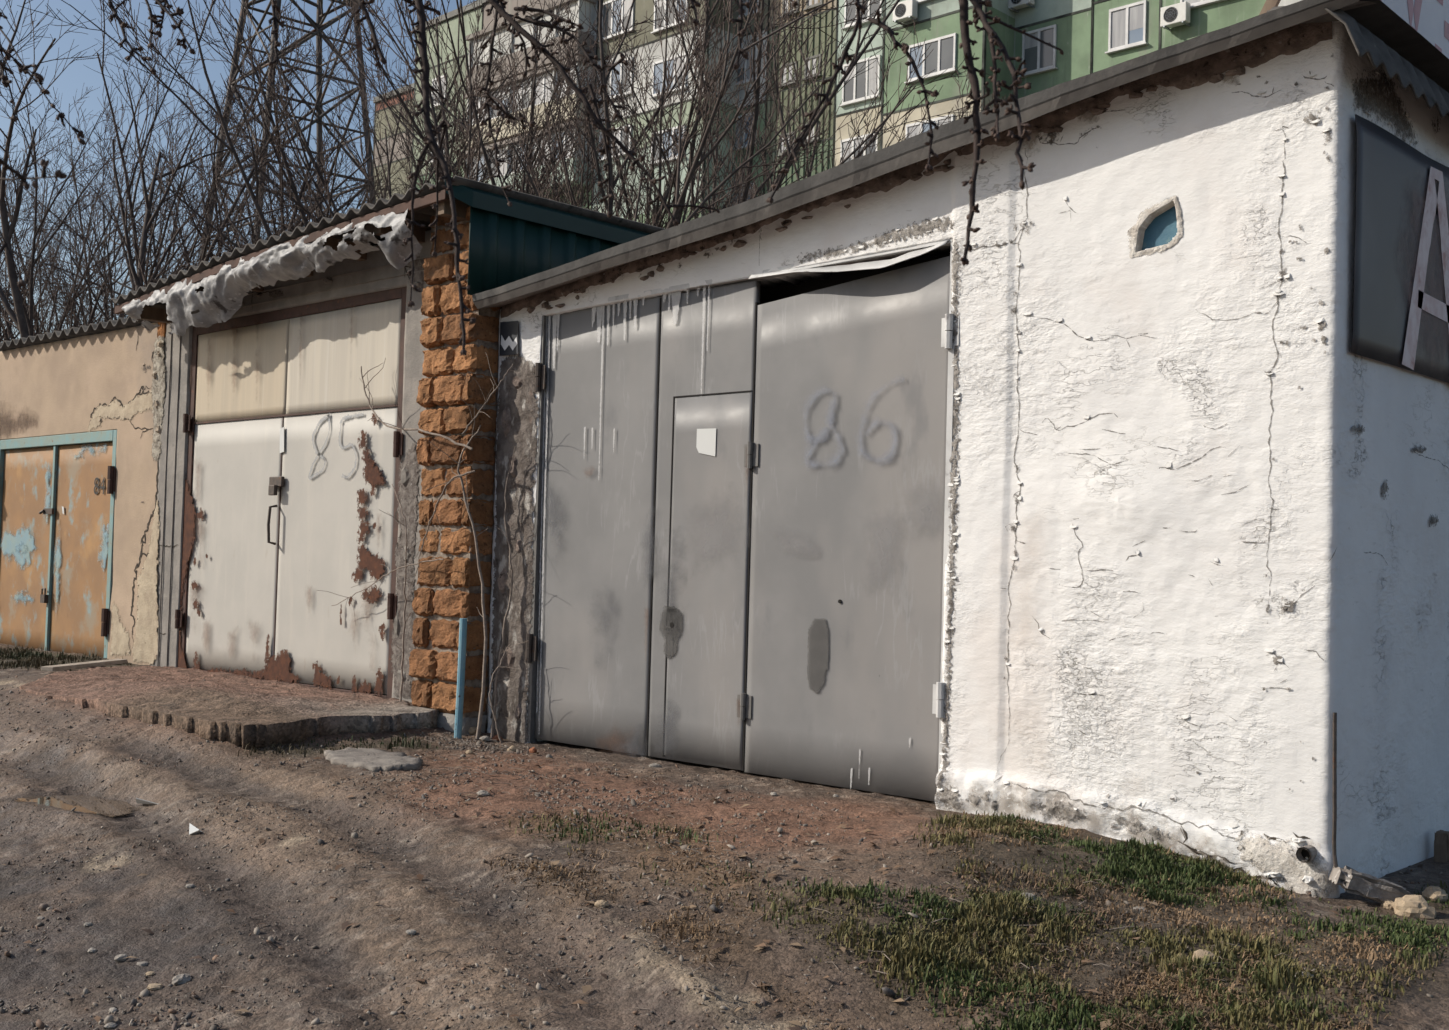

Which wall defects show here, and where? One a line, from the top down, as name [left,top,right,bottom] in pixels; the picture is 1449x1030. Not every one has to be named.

spalling [74,336,166,461]
water stain [584,298,644,480]
water stain [662,286,710,392]
peeling [0,528,36,569]
peeling [98,524,109,570]
crack [89,340,179,647]
corrosion [177,478,384,697]
corrosion [340,413,386,625]
crack [963,71,1388,885]
spalling [1027,799,1086,824]
spalling [1111,815,1170,844]
spalling [1234,831,1332,897]